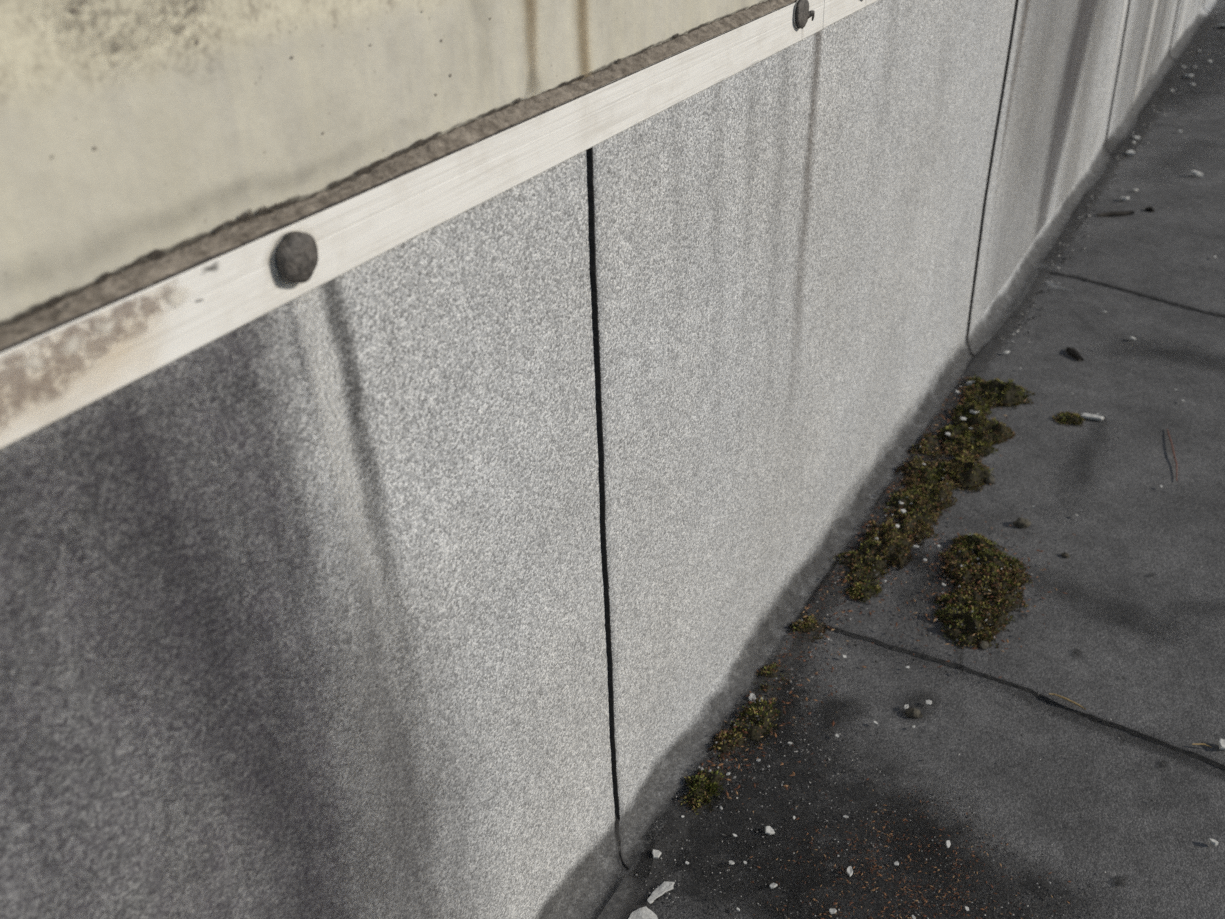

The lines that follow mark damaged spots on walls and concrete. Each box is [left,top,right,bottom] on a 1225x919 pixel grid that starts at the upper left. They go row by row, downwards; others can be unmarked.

water stain [0,324,344,919]
water stain [303,280,368,564]